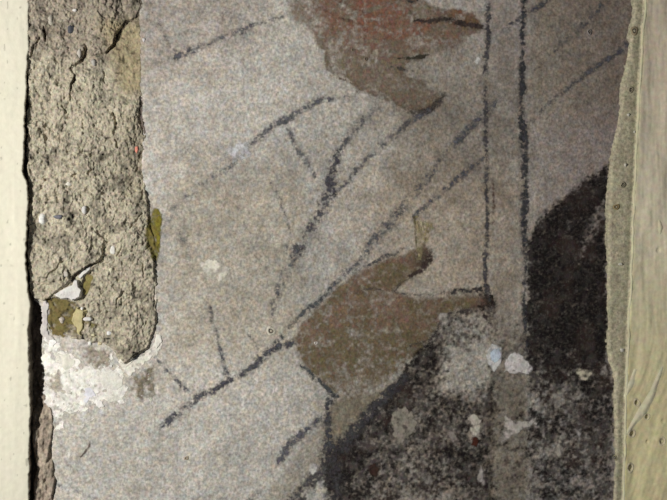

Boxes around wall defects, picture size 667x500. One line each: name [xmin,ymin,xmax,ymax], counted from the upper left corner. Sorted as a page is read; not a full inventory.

crack [106,0,142,53]
flaking render [26,0,163,439]
peeling [505,352,532,374]